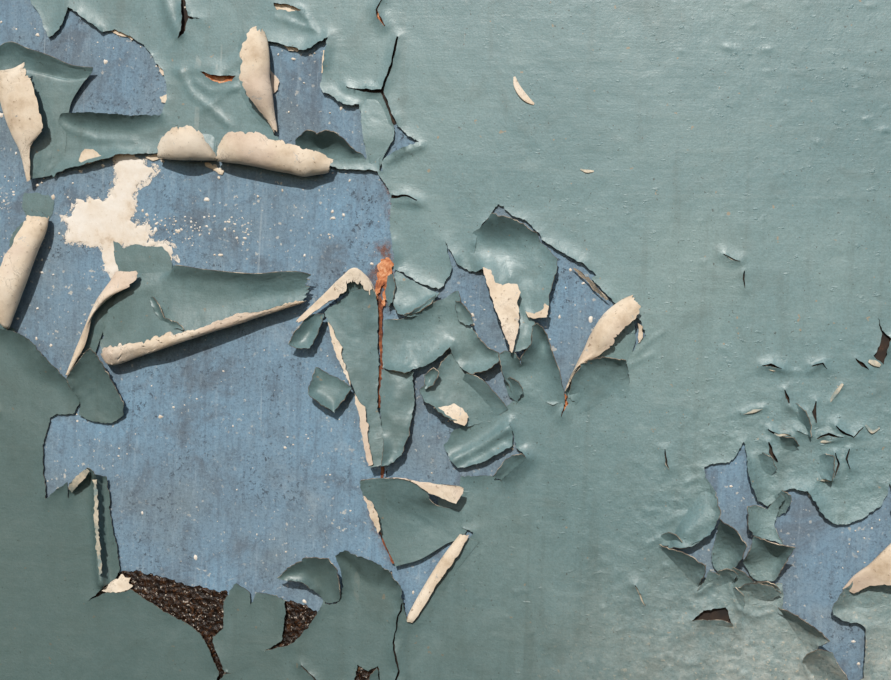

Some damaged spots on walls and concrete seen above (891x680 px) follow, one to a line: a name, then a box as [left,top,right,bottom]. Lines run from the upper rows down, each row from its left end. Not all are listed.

crack [391,194,417,202]
peeling [0,0,646,680]
rust [374,246,394,408]
peeling [868,322,891,367]
peeling [774,433,799,451]
peeling [795,403,830,443]
peeling [659,442,891,680]
crack [393,603,405,680]